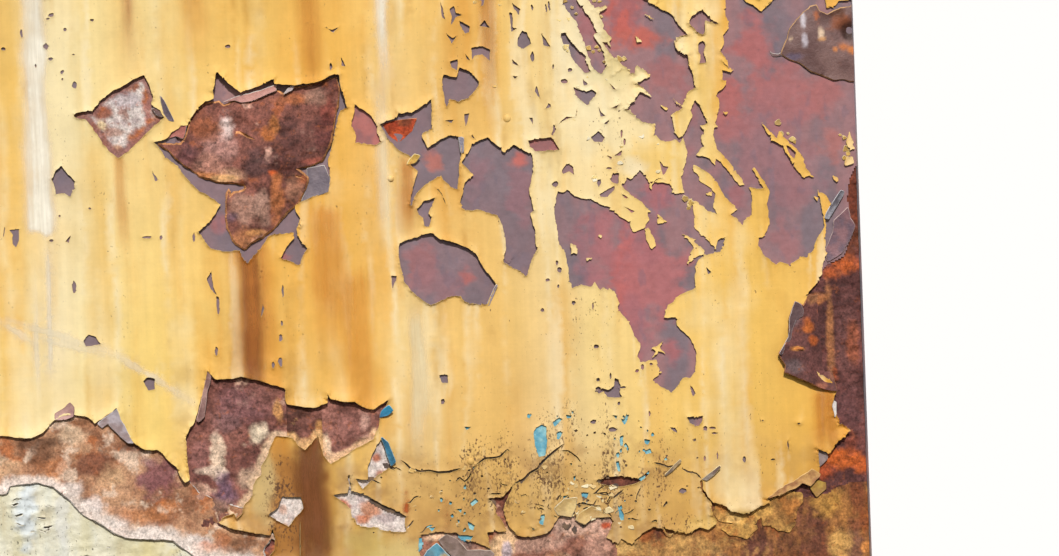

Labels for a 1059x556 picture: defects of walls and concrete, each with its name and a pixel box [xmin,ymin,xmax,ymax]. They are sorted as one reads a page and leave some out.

peeling [70,0,857,398]
rust [0,255,393,556]
peeling [265,491,304,531]
peeling [328,433,526,551]
peeling [527,373,668,533]
rust [414,166,870,556]
peeling [670,411,717,441]